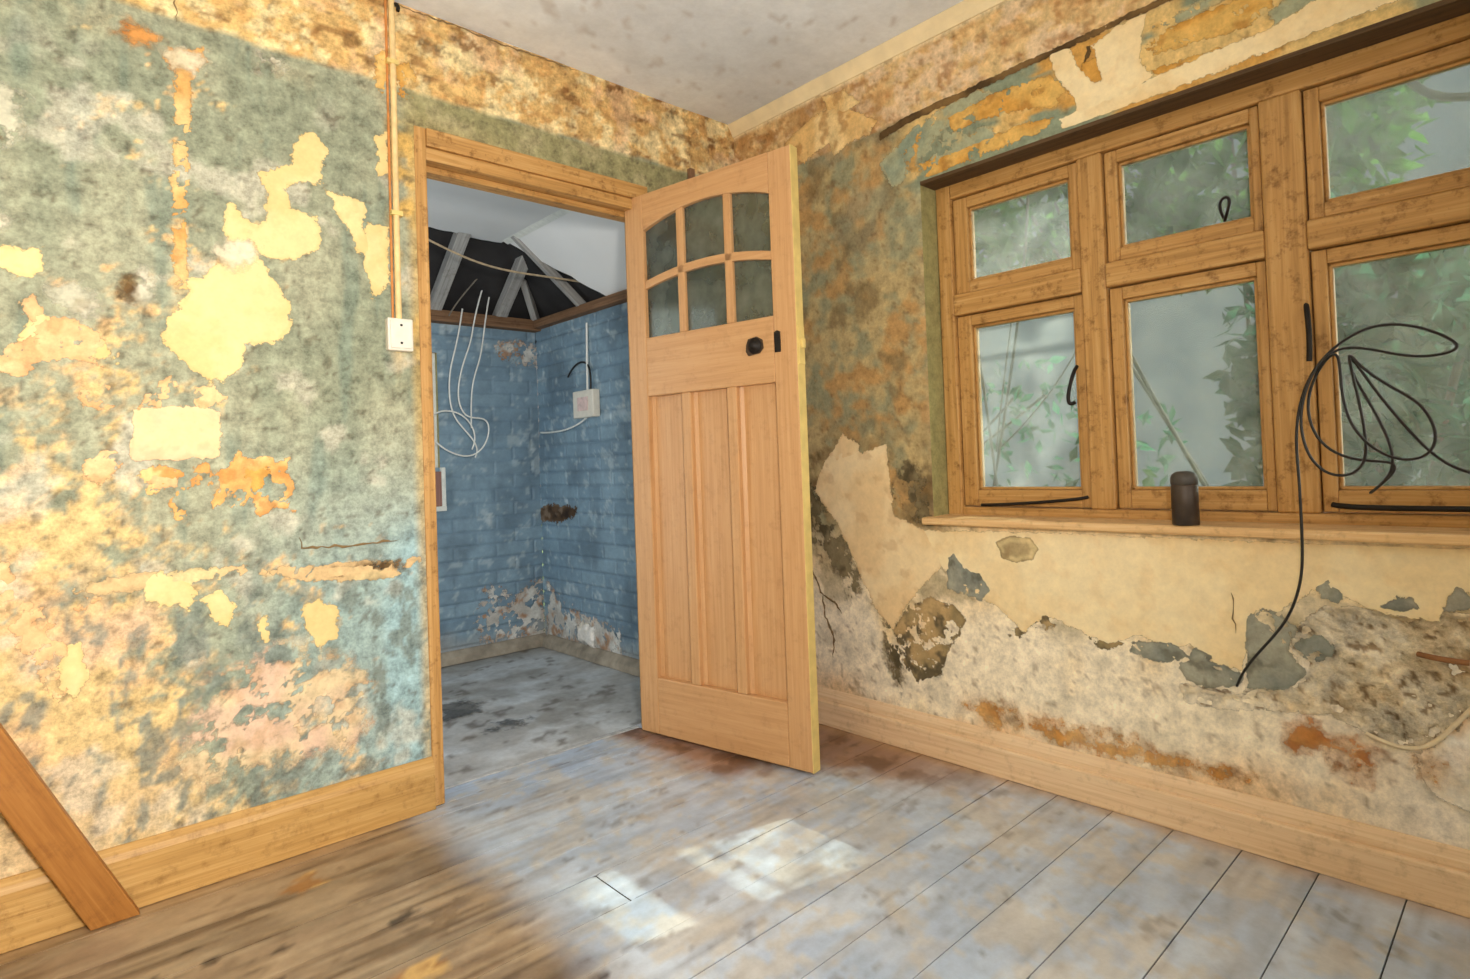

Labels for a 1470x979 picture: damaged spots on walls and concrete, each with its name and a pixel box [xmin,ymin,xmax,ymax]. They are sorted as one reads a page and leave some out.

peeling [1081,58,1102,83]
peeling [1146,0,1316,75]
peeling [880,75,1070,187]
peeling [0,244,120,411]
peeling [82,131,391,521]
peeling [144,570,238,627]
peeling [165,598,372,792]
peeling [473,578,625,655]
peeling [893,554,990,683]
peeling [996,536,1038,563]
peeling [1008,615,1056,639]
spalling [1089,580,1470,751]